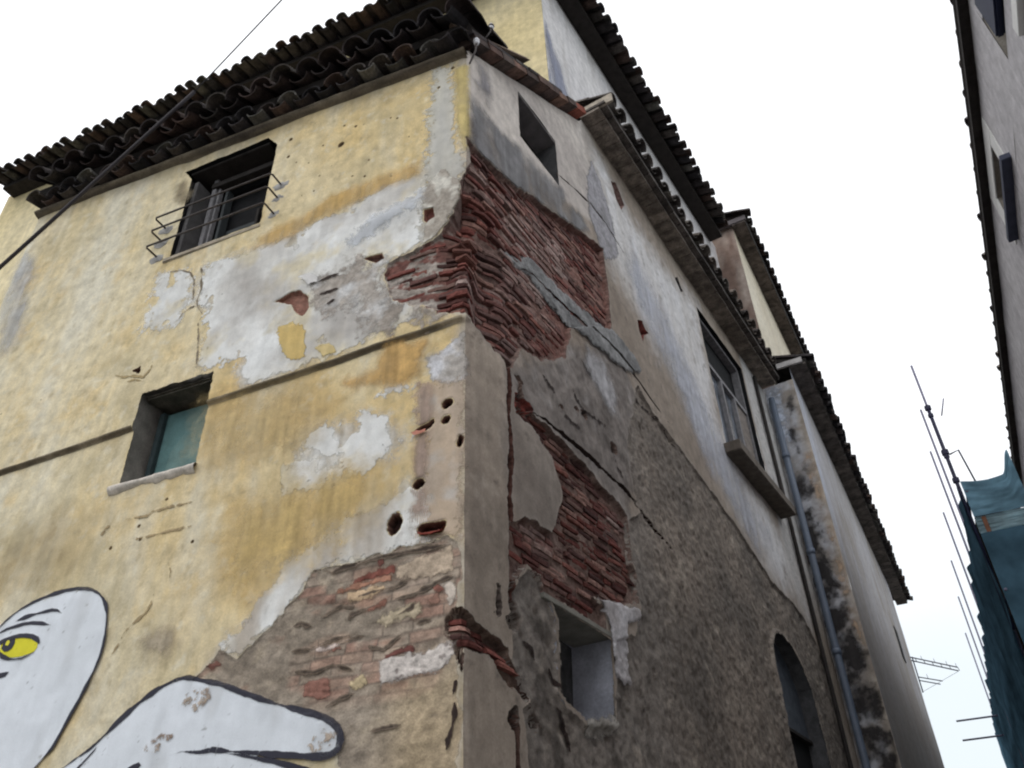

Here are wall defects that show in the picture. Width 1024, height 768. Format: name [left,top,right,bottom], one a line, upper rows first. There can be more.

flaking render [138,62,848,768]
crack [506,360,677,549]
mould [766,388,798,449]
crack [508,579,516,602]
mould [796,475,897,768]